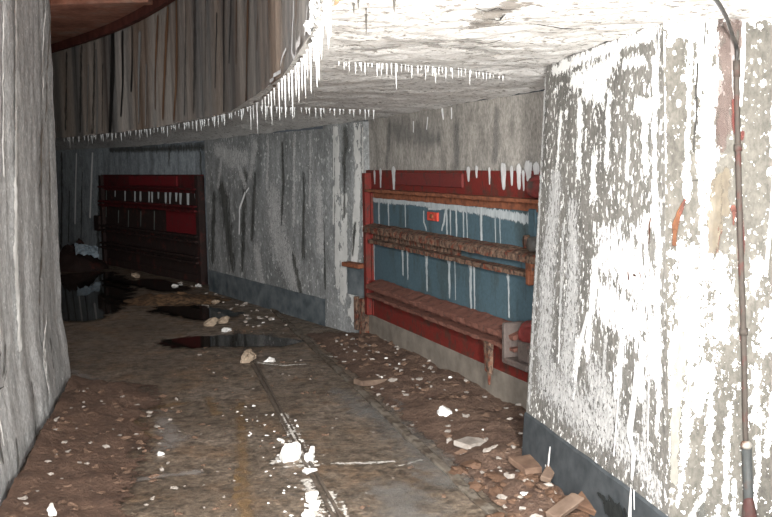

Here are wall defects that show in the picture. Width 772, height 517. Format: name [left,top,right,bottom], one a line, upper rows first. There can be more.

peeling [459,0,534,29]
peeling [552,22,701,221]
corrosion [713,19,745,152]
water stain [109,122,364,323]
corrosion [672,199,686,246]
peeling [667,230,739,486]
peeling [732,240,772,445]
spalling [597,492,628,517]